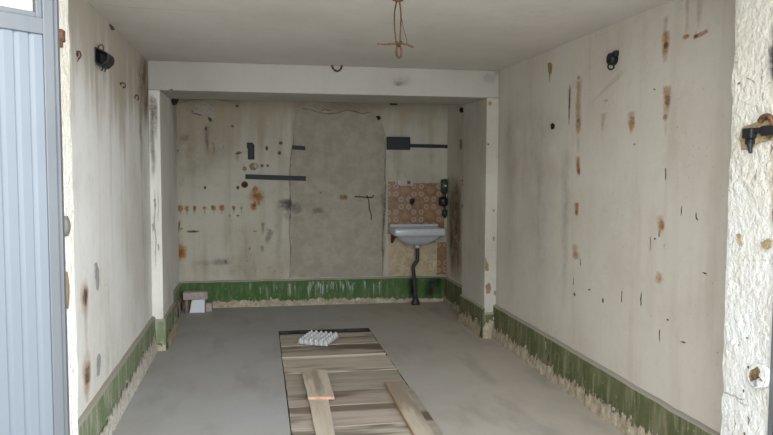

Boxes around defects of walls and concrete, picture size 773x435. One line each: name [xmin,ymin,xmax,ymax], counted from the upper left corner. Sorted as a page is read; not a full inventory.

spalling [98,296,191,435]
spalling [205,295,658,435]
spalling [743,364,770,392]